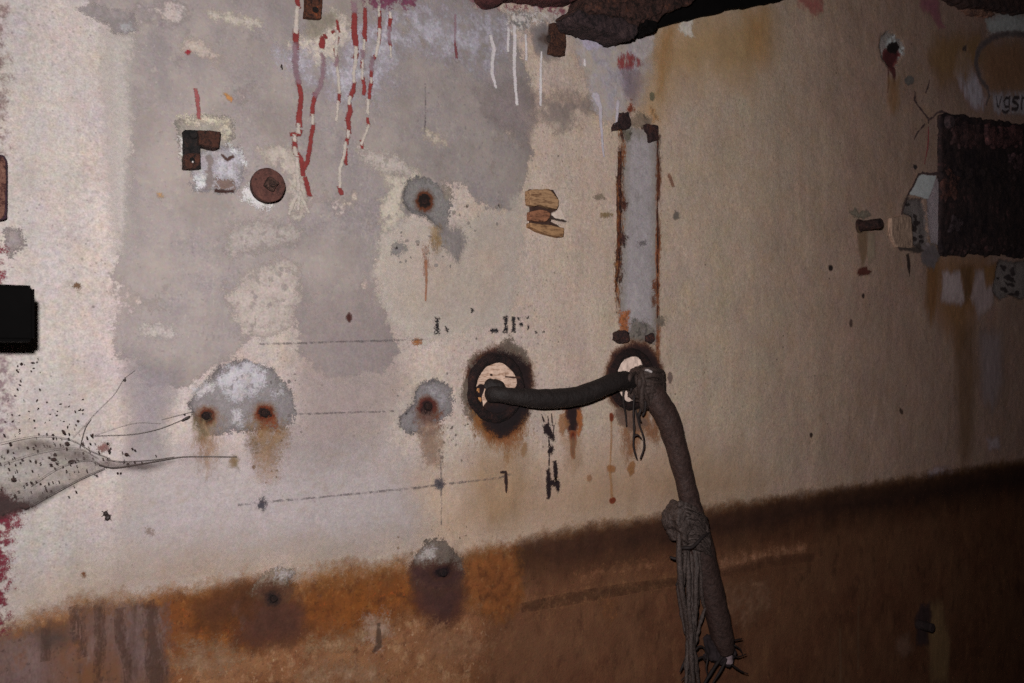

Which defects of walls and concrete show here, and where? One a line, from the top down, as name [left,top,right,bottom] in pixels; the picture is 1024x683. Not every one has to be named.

peeling [678,19,695,39]
corrosion [882,48,900,111]
corrosion [414,189,434,213]
corrosion [939,168,960,203]
corrosion [600,129,664,375]
corrosion [194,406,217,442]
corrosion [248,404,286,461]
corrosion [416,396,442,437]
corrosion [459,337,535,460]
corrosion [607,394,659,475]
water stain [0,460,1024,683]